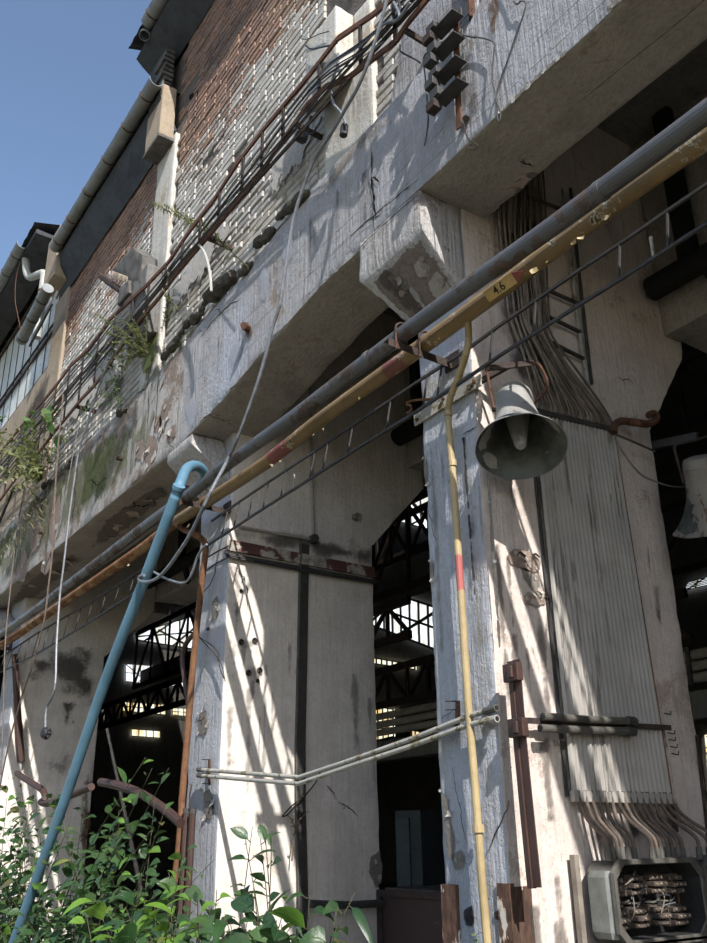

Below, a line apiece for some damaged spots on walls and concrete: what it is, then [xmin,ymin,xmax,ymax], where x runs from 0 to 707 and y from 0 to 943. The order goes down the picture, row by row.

rust [489,0,498,32]
crack [335,152,419,251]
peeling [374,241,450,318]
damp [126,439,136,483]
peeling [135,400,176,472]
rust [207,539,380,585]
spalling [487,474,552,648]